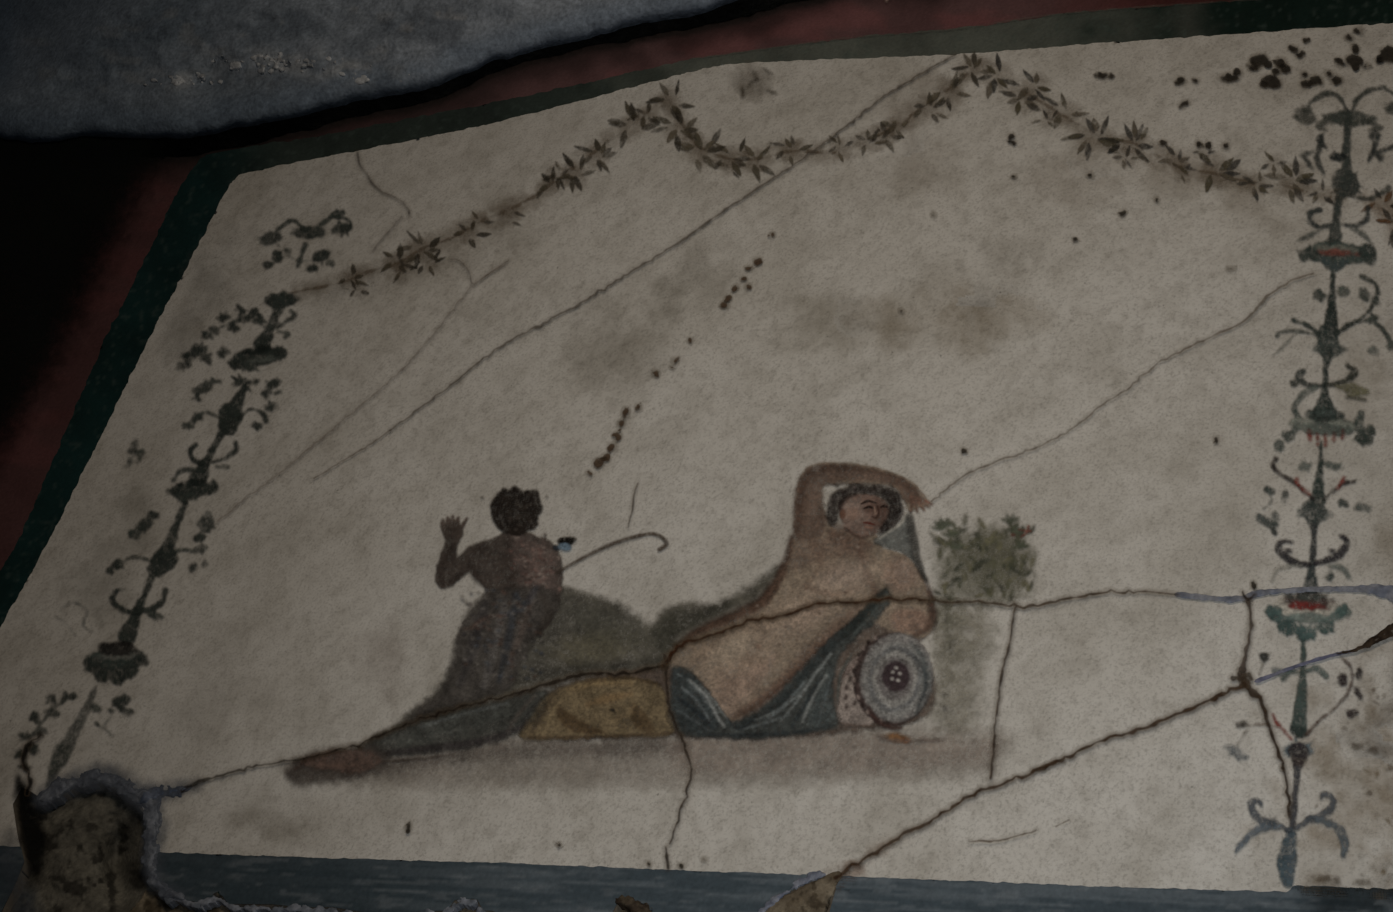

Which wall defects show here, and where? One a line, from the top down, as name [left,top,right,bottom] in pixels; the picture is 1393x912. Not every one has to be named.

peeling [1220,28,1393,88]
crack [315,55,955,478]
crack [932,273,1313,501]
crack [181,584,1393,880]
flaking render [10,766,353,912]
flaking render [425,897,486,912]
flaking render [615,895,652,912]
flaking render [758,870,841,912]